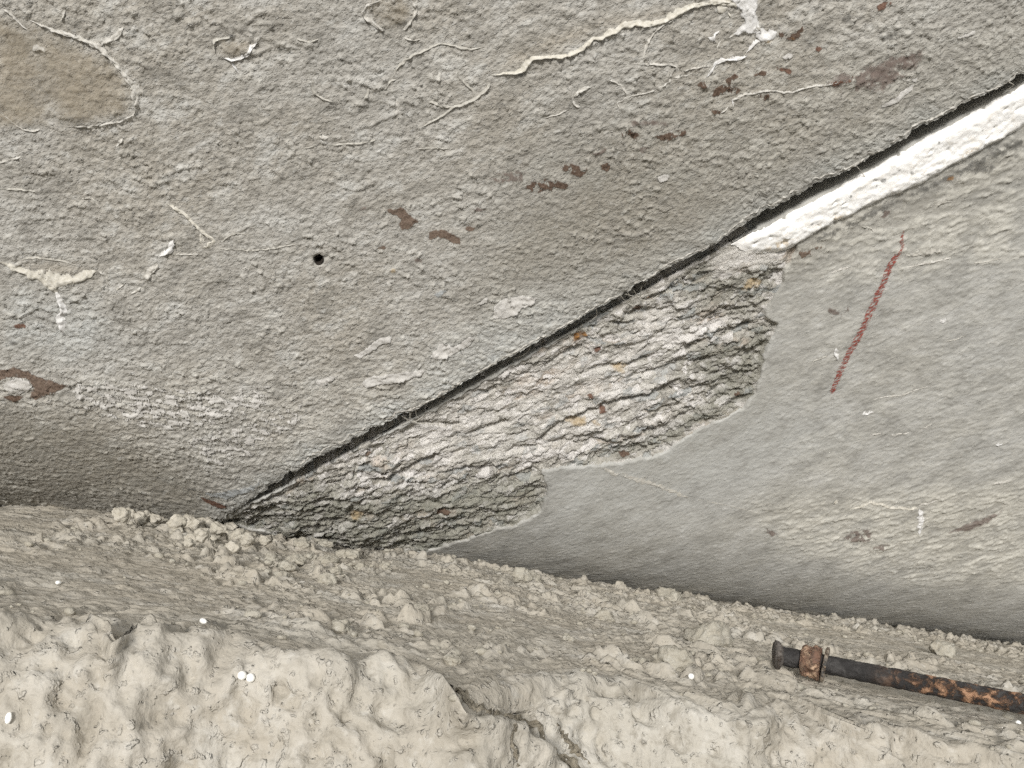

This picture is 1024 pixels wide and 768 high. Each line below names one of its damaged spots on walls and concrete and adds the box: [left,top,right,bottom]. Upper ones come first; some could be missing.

rust [779,26,803,41]
crack [364,0,747,150]
rust [698,74,741,96]
crack [721,82,839,113]
crack [303,134,375,149]
rust [494,164,587,193]
crack [168,204,296,252]
rust [387,207,418,230]
rust [429,226,475,244]
rust [0,367,67,402]
spalling [206,220,796,552]
peeling [72,381,307,466]